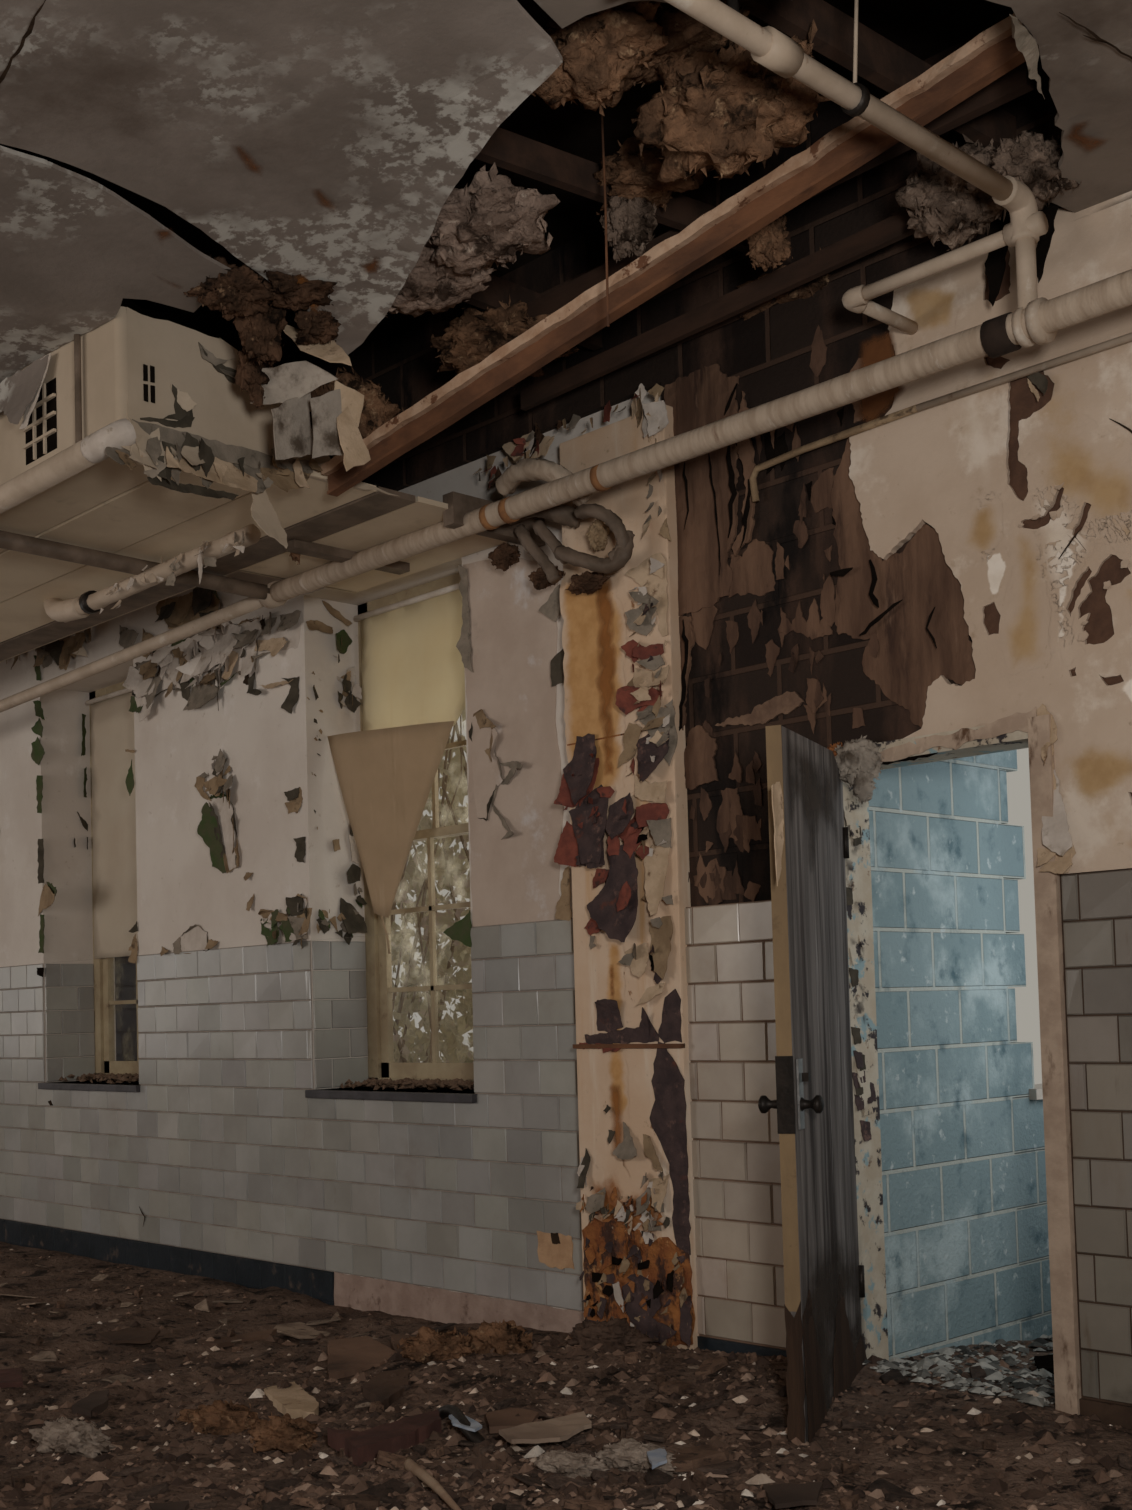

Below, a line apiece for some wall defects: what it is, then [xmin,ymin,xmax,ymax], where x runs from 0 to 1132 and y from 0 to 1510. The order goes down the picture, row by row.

crack [0,0,46,83]
crack [1059,12,1132,59]
peeling [105,384,323,549]
flaking render [473,290,895,488]
peeling [31,700,45,813]
peeling [37,839,57,977]
peeling [6,532,362,756]
peeling [195,749,368,950]
rust [560,572,627,793]
flaking render [443,400,1076,1053]
flaking render [1068,555,1131,645]
rust [579,937,695,1348]